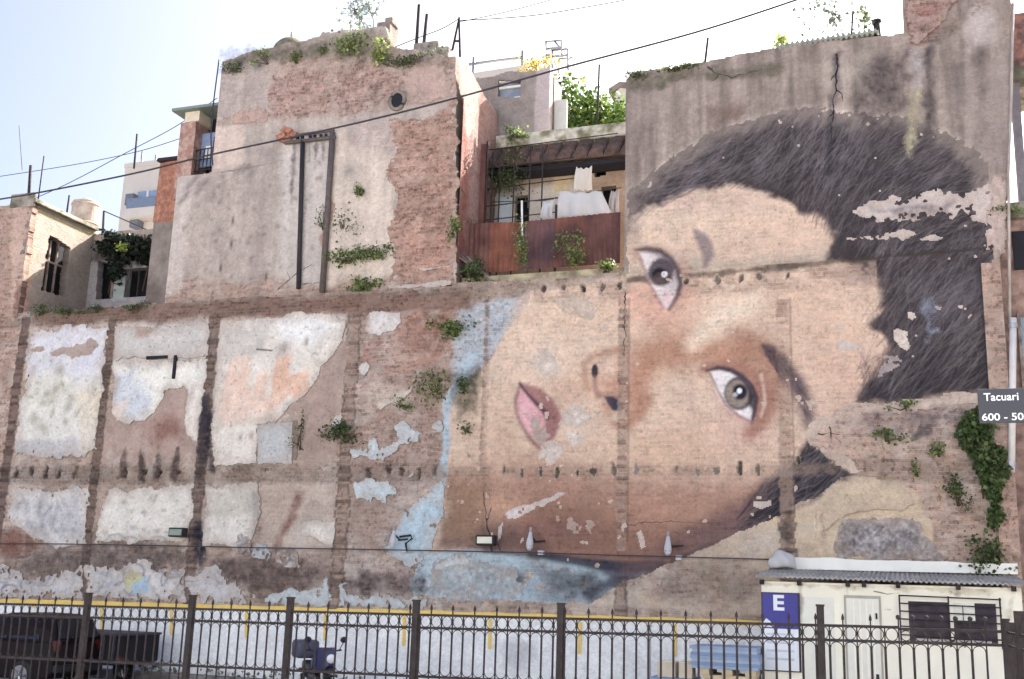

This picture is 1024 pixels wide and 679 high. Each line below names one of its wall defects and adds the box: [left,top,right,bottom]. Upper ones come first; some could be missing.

crack [827,54,843,143]
flaking render [232,58,461,289]
peeling [847,174,1007,256]
leakage [120,447,179,482]
peeling [14,311,370,467]
leakage [198,395,214,472]
peeling [350,420,444,461]
flaking render [831,455,863,474]
flaking render [861,393,978,415]
leakage [193,522,205,563]
peeling [0,478,524,611]
flaking render [834,518,942,561]